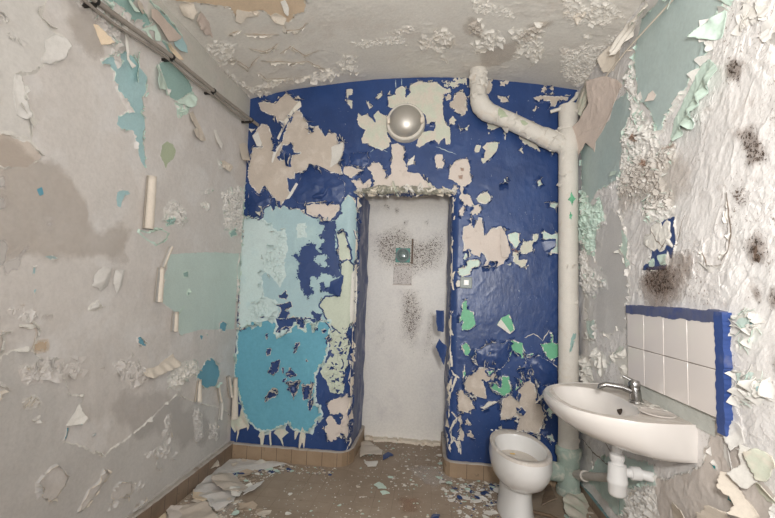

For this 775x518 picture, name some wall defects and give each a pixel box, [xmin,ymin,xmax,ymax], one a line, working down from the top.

peeling [0,132,45,170]
water stain [737,127,768,165]
peeling [566,0,775,383]
peeling [76,0,627,452]
water stain [374,221,443,275]
water stain [746,237,769,264]
water stain [642,266,679,302]
peeling [725,364,774,410]
peeling [0,346,230,518]
peeling [588,417,740,518]
peeling [739,481,775,518]